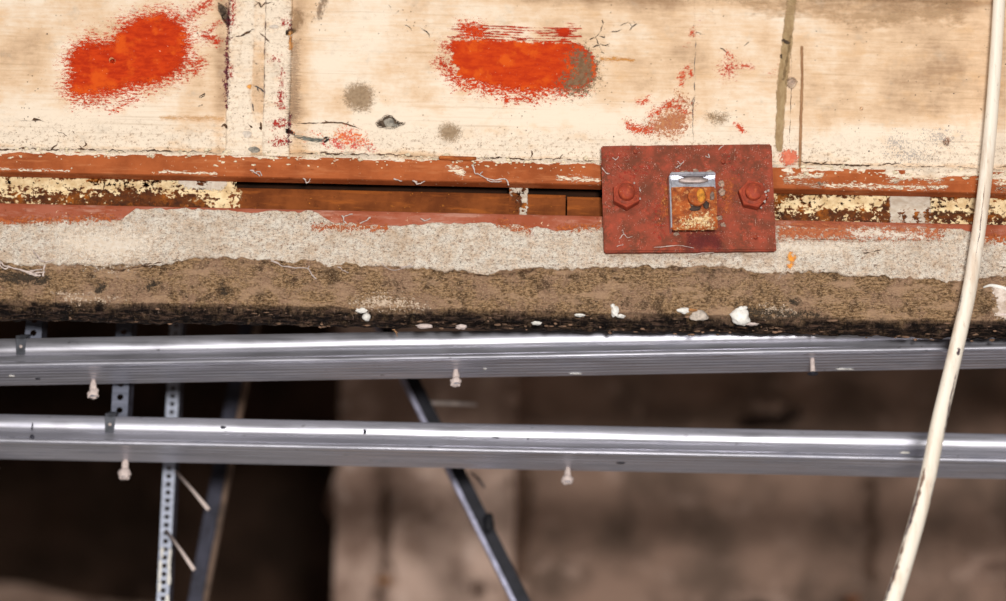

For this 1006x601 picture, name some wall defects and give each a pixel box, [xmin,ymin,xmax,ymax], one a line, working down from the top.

leakage [775,0,959,191]
peeling [0,177,245,208]
peeling [774,193,890,222]
peeling [930,197,976,224]
peeling [987,198,1006,225]